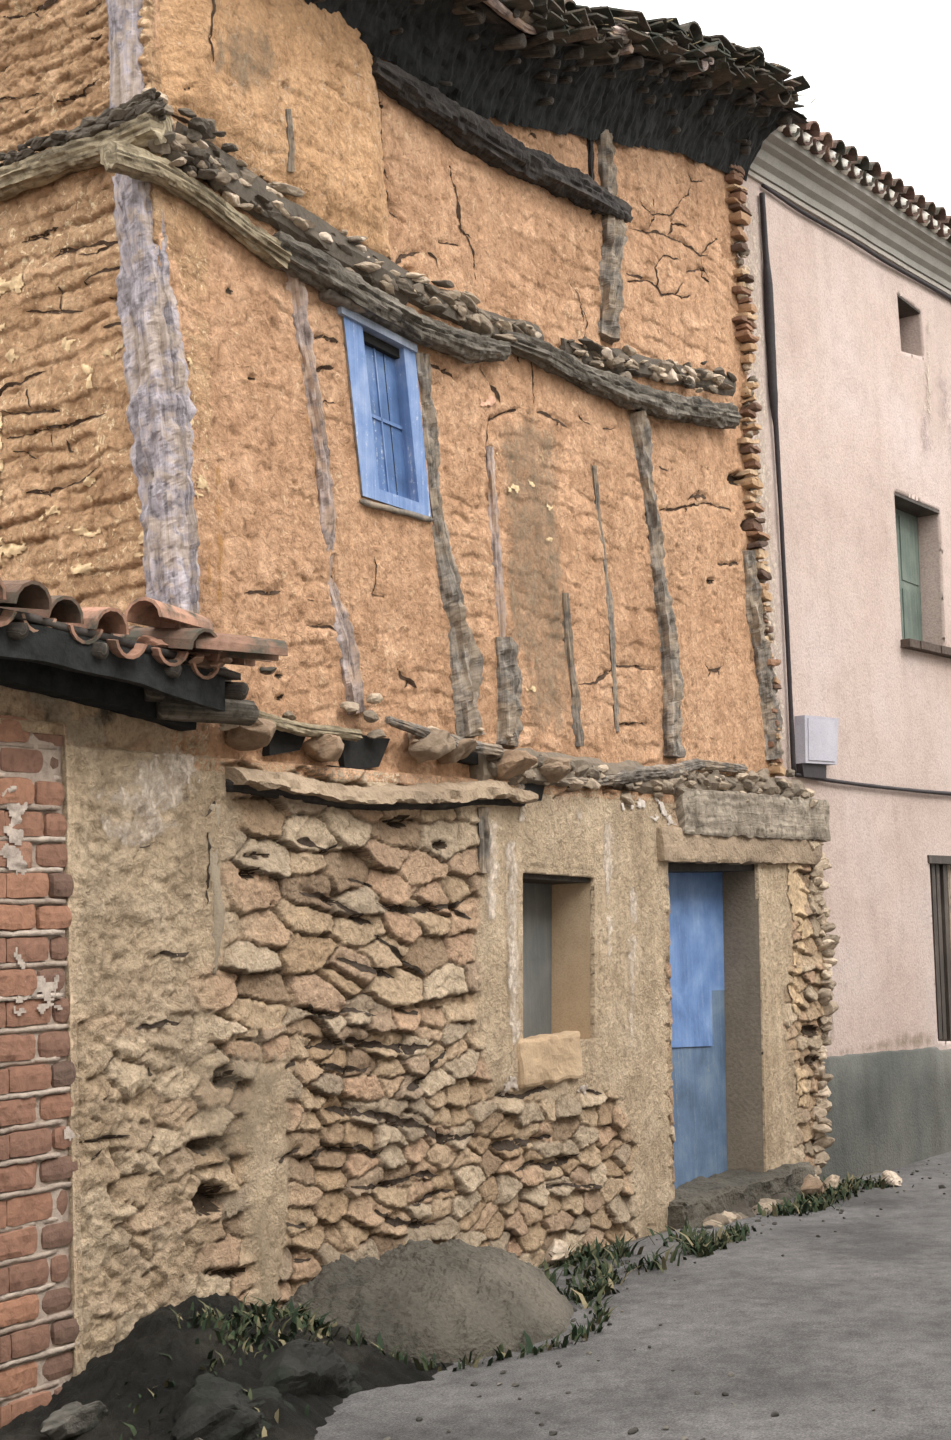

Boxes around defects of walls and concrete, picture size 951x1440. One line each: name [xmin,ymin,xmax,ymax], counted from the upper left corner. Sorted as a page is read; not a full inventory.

crack [395,166,476,280]
crack [626,176,717,299]
crack [659,490,730,512]
spalling [382,815,410,828]
spalling [432,840,447,850]
spalling [238,851,270,880]
spalling [209,1064,242,1089]
spalling [191,1183,223,1216]